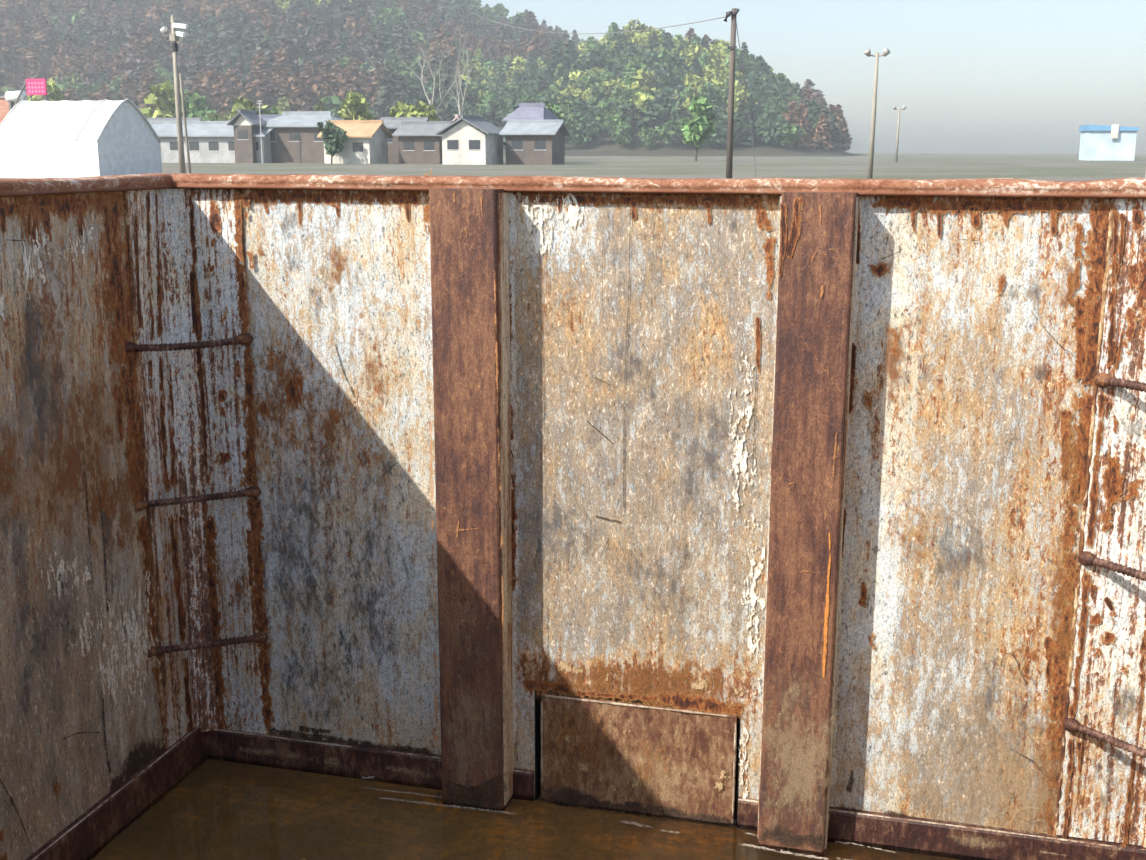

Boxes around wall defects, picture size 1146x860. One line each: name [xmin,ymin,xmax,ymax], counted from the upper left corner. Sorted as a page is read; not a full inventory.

rust [0,191,179,643]
rust [168,514,187,642]
rust [182,657,193,733]
rust [189,195,211,485]
rust [204,189,438,754]
rust [494,277,517,665]
rust [523,657,756,719]
rust [849,196,1140,847]
rust [1137,600,1146,727]